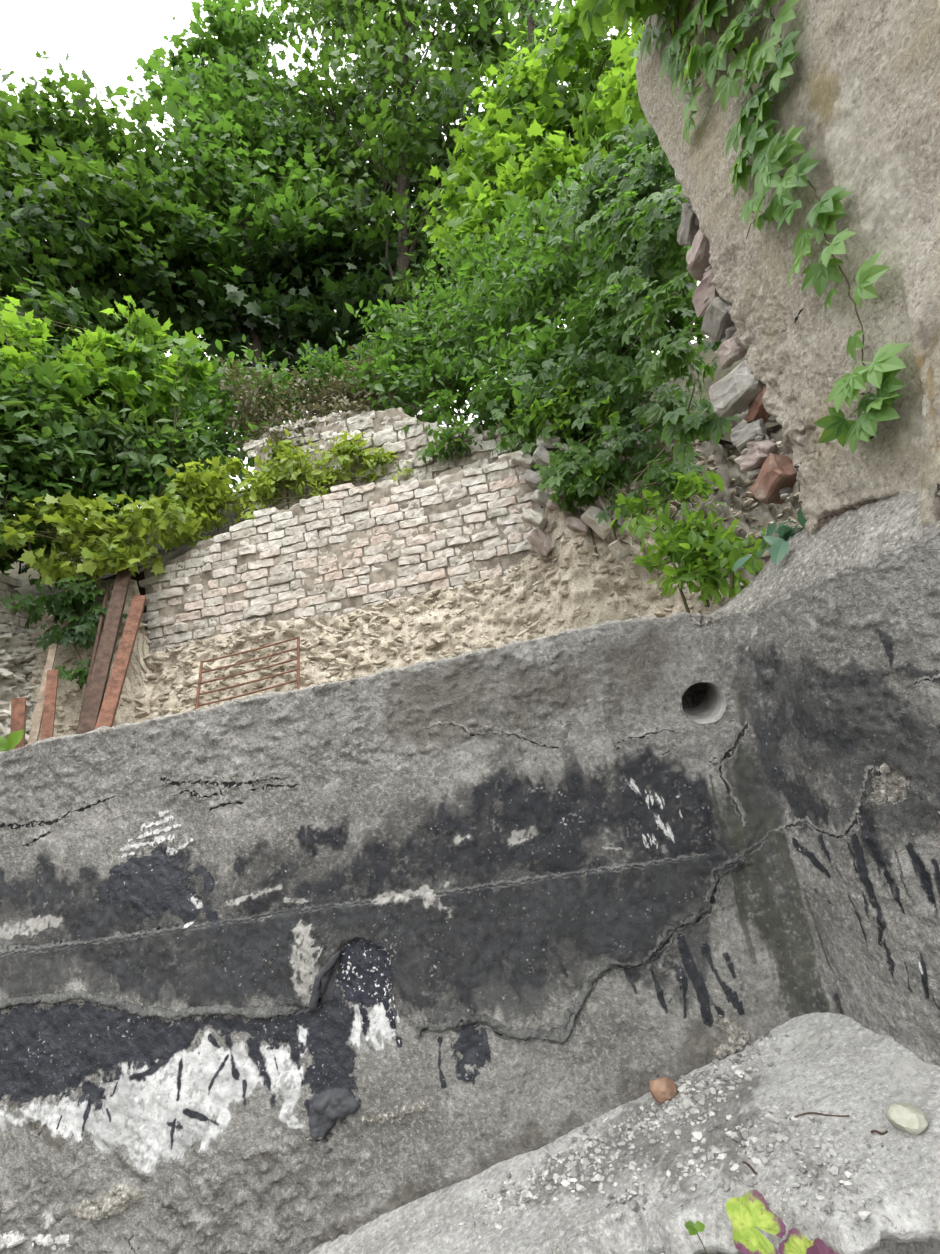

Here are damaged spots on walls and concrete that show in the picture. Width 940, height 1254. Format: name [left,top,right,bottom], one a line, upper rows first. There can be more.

peeling [118,810,193,858]
peeling [0,915,62,940]
peeling [372,882,452,918]
crack [0,717,880,1044]
leakage [694,741,841,1018]
leakage [847,834,940,1010]
leakage [650,943,745,1018]
peeling [350,1002,400,1051]
leakage [106,1058,218,1149]
peeling [0,920,345,1222]
leakage [196,1032,303,1107]
spalling [0,1231,72,1251]